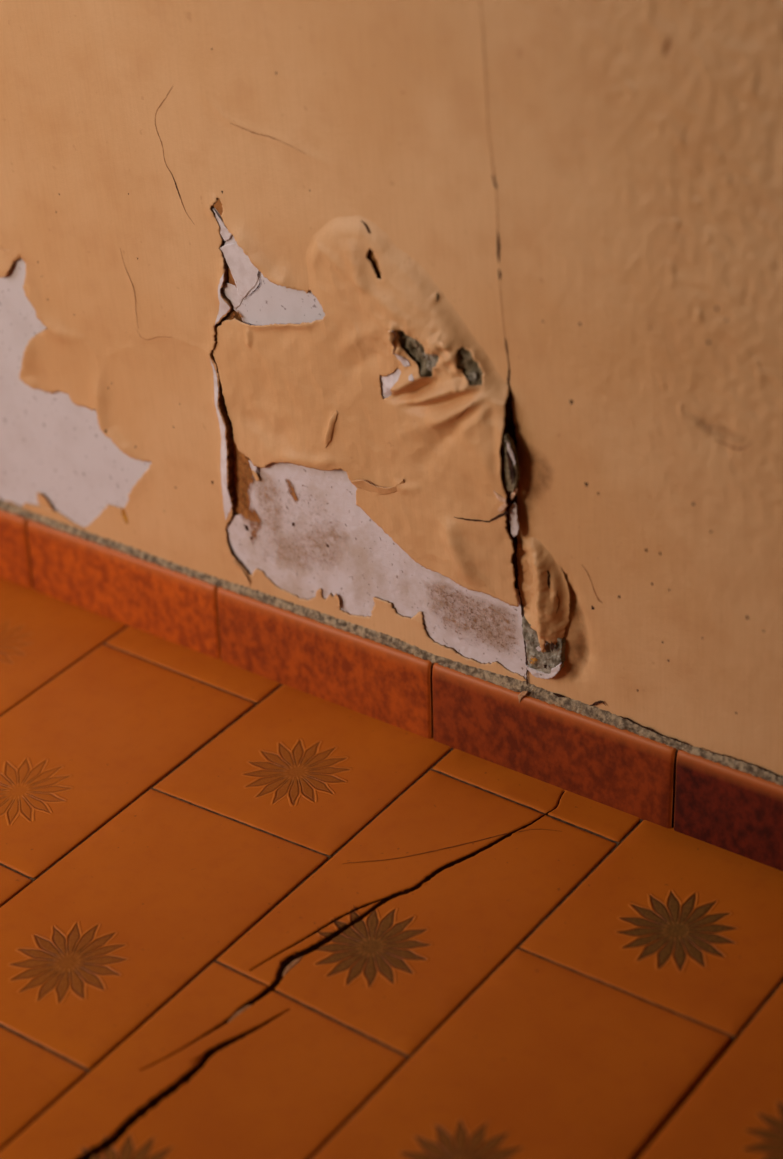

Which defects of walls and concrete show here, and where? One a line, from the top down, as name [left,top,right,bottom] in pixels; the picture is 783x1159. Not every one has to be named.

peeling [0,249,152,527]
crack [155,88,195,225]
peeling [213,191,325,326]
crack [480,0,783,778]
peeling [227,435,566,703]
crack [77,792,564,1159]